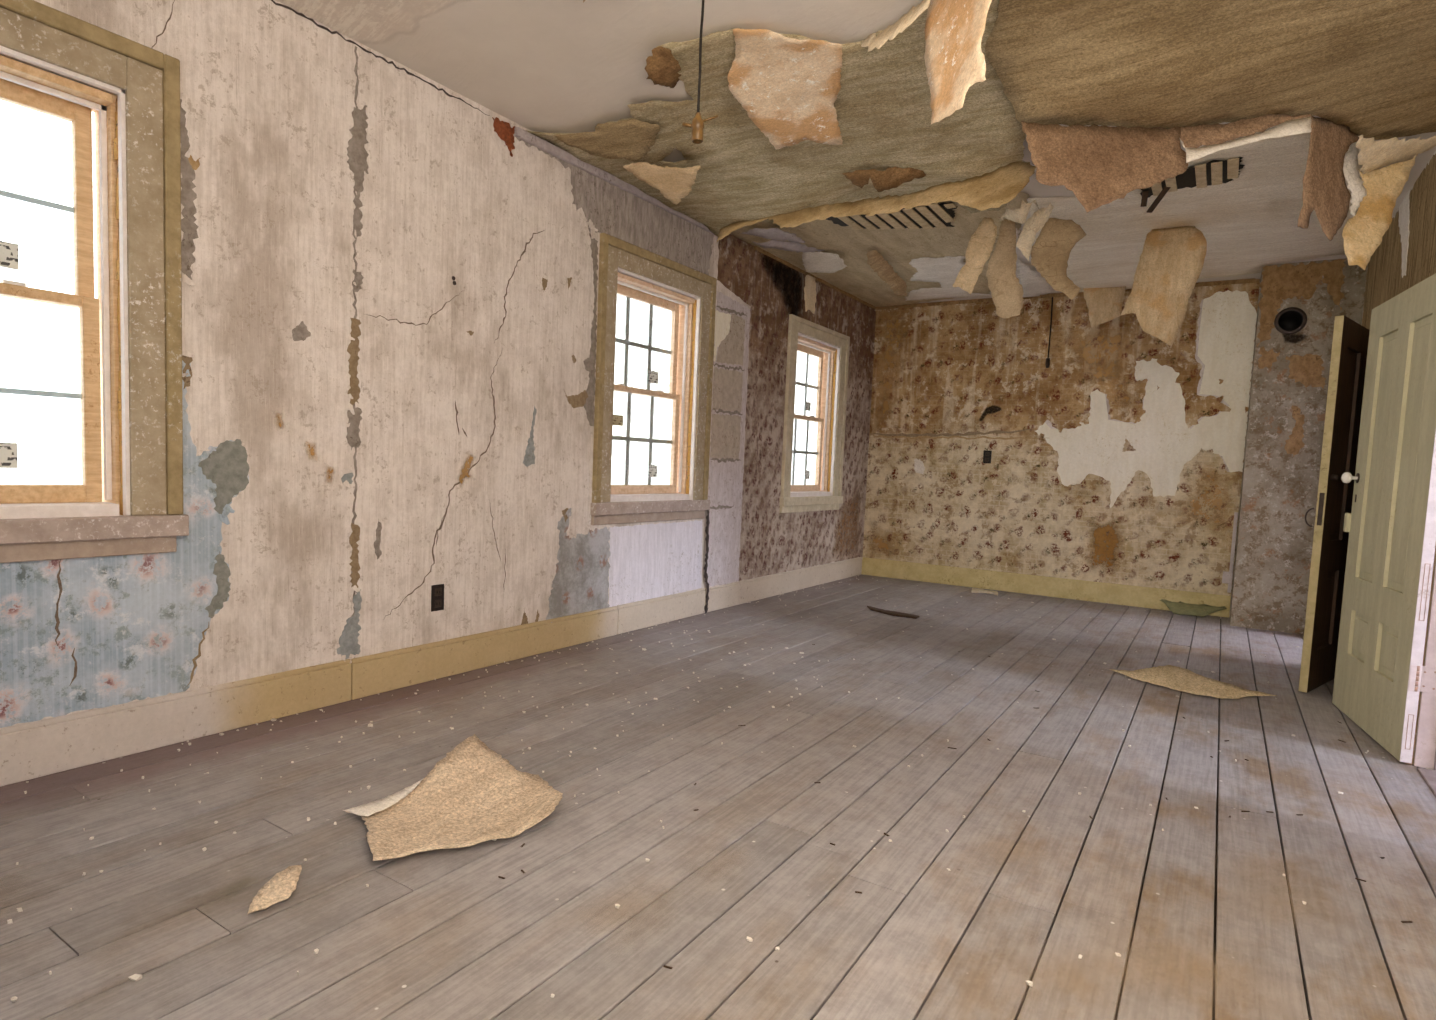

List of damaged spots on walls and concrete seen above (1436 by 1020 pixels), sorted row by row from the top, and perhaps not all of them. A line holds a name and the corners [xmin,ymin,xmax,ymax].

flaking render [347,102,369,240]
crack [352,175,462,326]
flaking render [492,117,714,426]
flaking render [905,256,991,301]
peeling [1362,154,1436,330]
flaking render [346,318,362,450]
crack [350,230,544,617]
flaking render [705,291,751,588]
peeling [1035,290,1257,508]
crack [55,559,77,686]
flaking render [337,519,382,663]
crack [703,510,711,613]